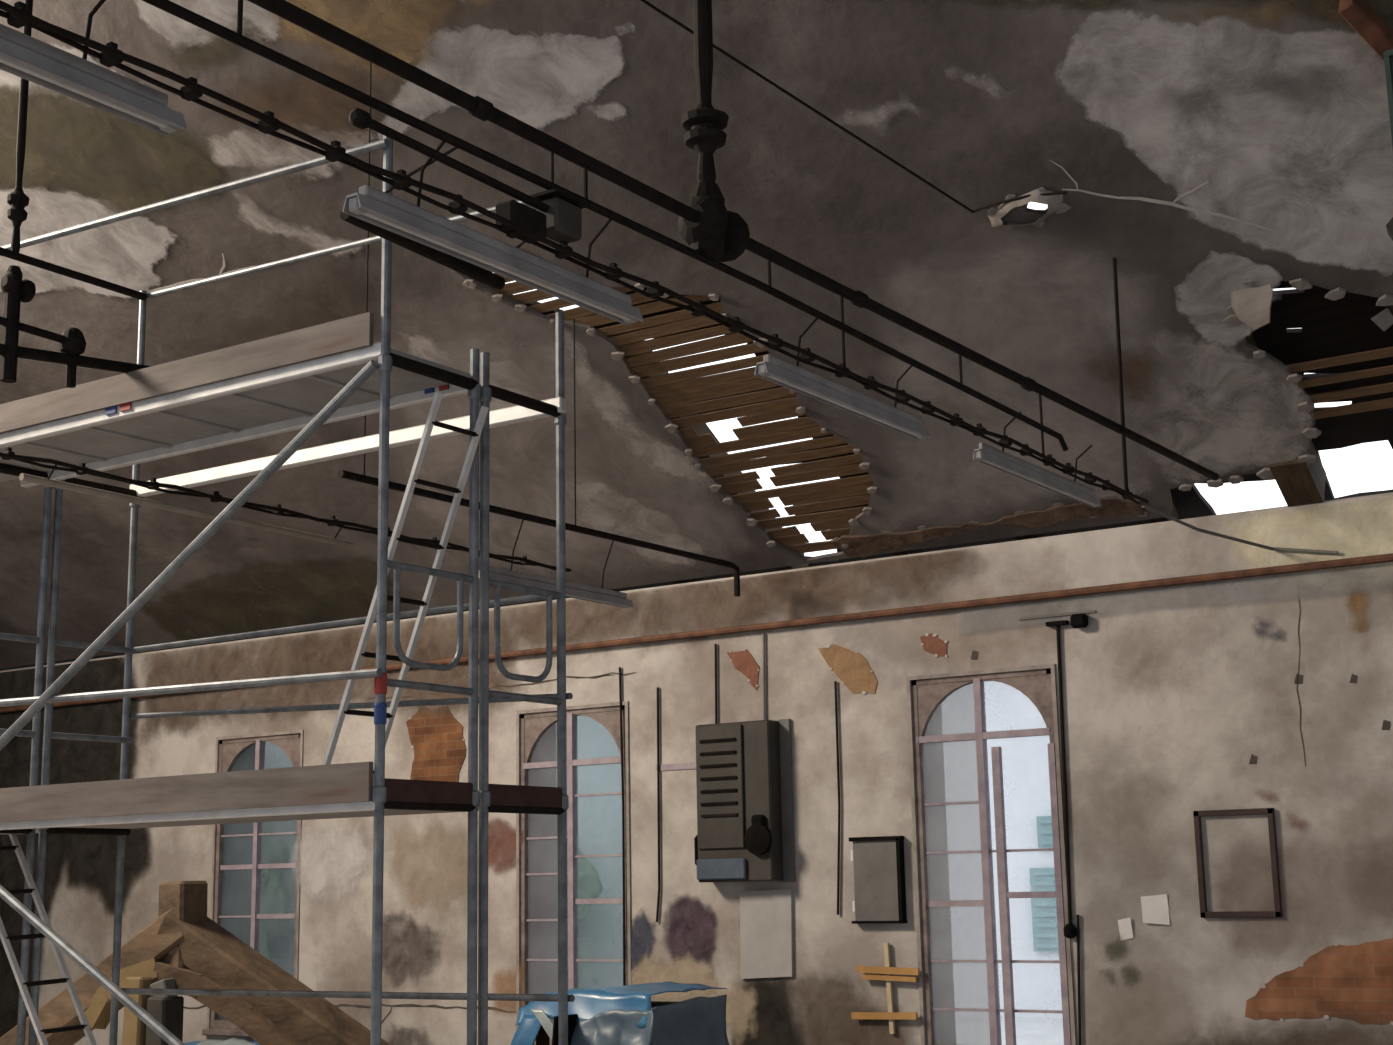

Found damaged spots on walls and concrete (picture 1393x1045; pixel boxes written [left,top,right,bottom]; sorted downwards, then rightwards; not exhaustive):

peeling [208,23,634,176]
peeling [0,187,176,298]
flaking render [463,279,478,289]
flaking render [492,294,526,312]
peeling [830,10,1393,558]
peeling [549,319,733,505]
peeling [569,482,703,565]
flaking render [818,644,878,694]
flaking render [406,706,466,782]
flaking render [1245,938,1393,1025]